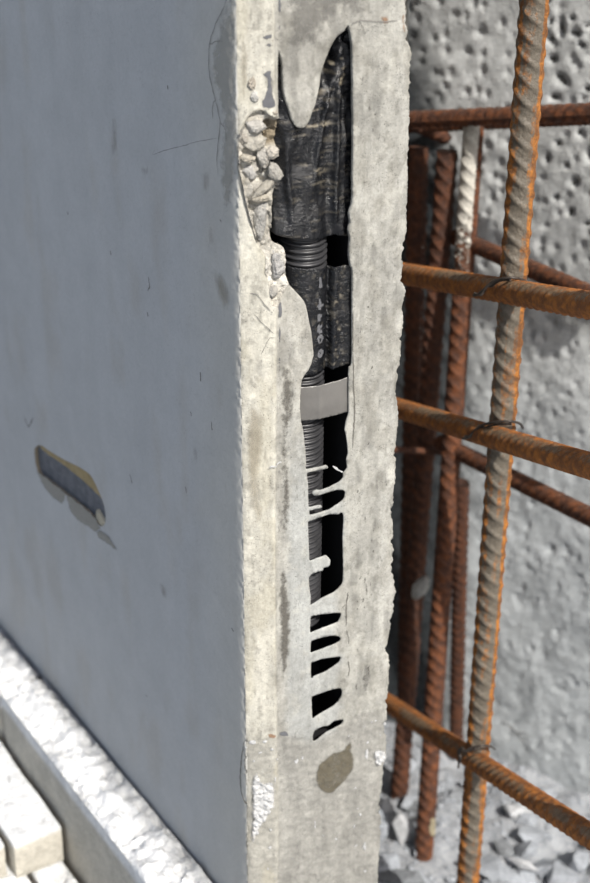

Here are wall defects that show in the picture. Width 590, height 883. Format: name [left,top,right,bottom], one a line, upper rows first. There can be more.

crack [156,1,226,169]
spalling [236,76,289,307]
spalling [37,472,115,549]